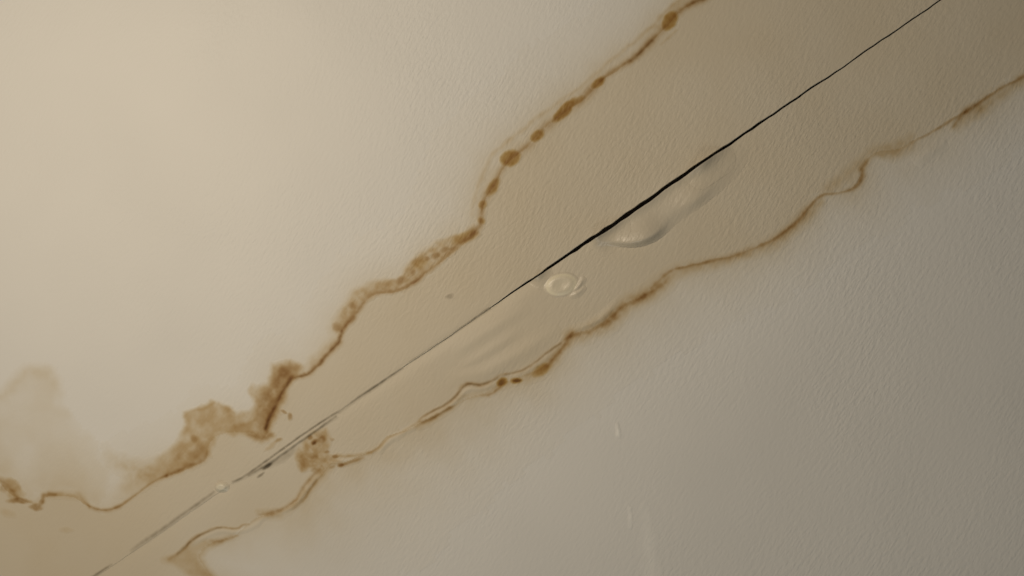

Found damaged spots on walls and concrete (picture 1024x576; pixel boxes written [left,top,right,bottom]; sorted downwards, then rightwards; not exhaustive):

leakage [469,0,714,234]
leakage [0,361,112,507]
leakage [0,475,142,514]
crack [89,562,113,576]
leakage [99,0,673,507]
crack [129,0,941,553]
leakage [100,91,1024,576]